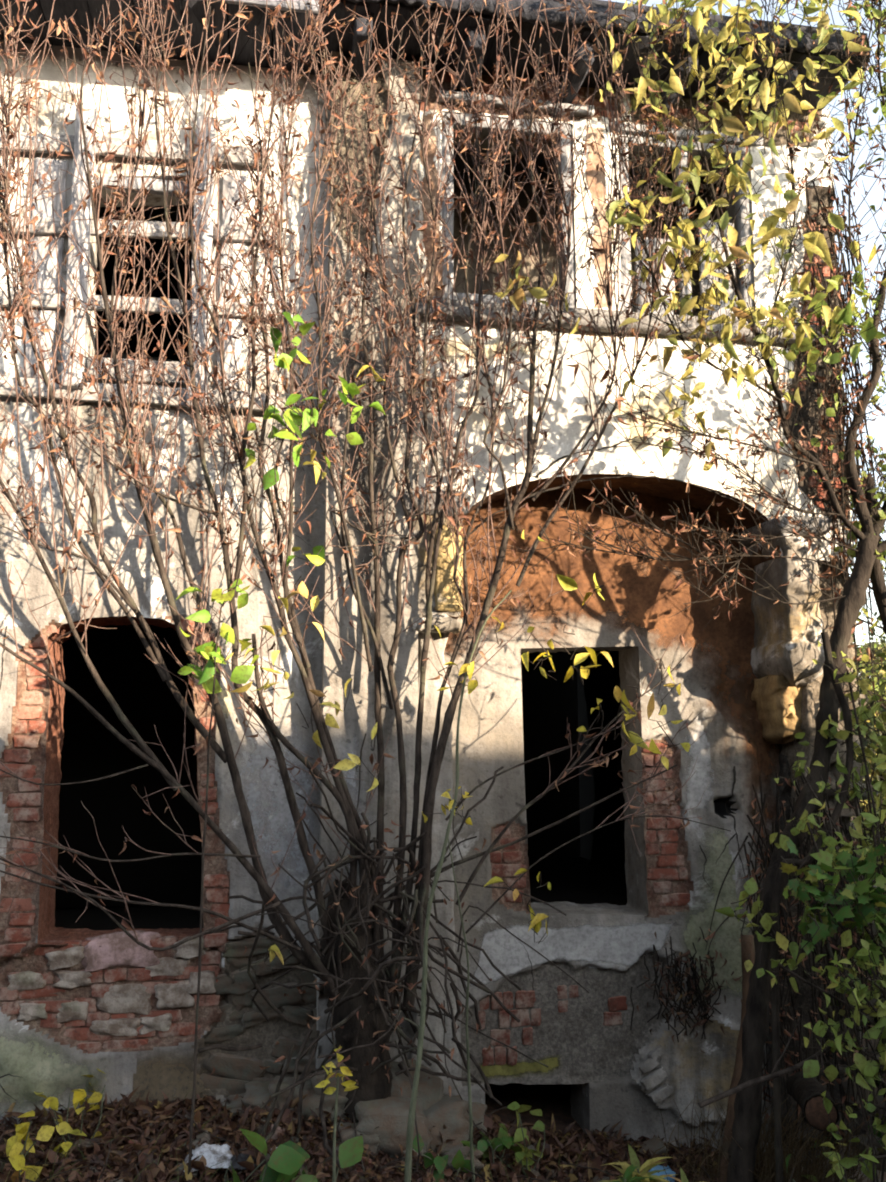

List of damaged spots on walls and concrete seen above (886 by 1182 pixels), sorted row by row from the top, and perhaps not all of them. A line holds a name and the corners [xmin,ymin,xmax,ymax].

spalling [0,616,317,1098]
flaking render [490,821,531,914]
flaking render [640,737,694,918]
flaking render [461,954,676,1087]